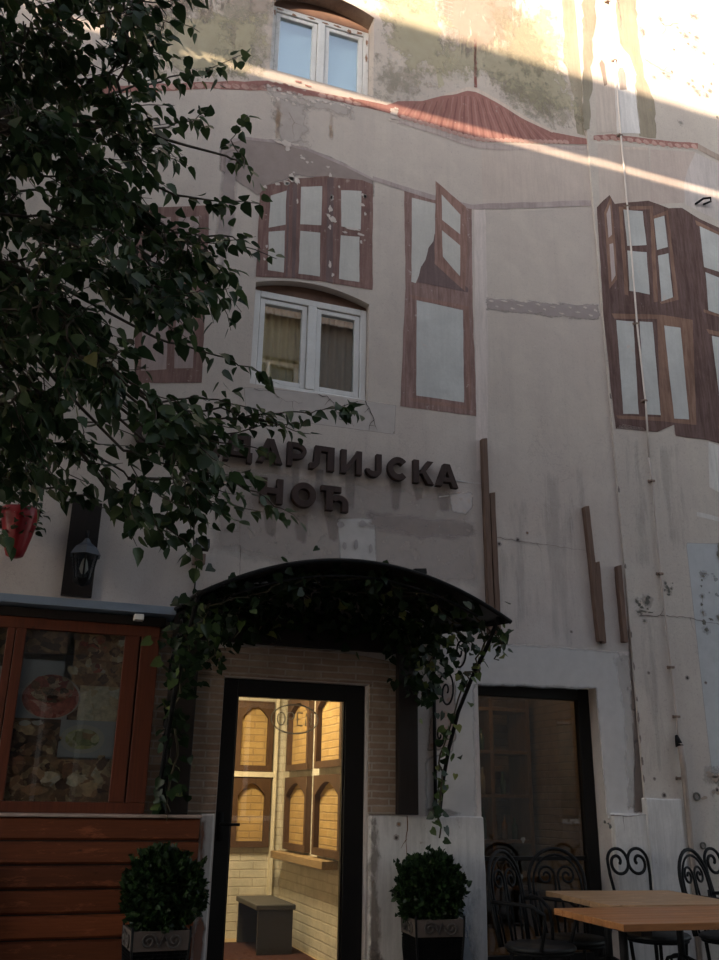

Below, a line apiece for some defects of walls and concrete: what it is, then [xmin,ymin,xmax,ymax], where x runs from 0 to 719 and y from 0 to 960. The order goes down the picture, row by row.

peeling [267,81,376,164]
peeling [263,172,300,189]
peeling [326,166,365,244]
crack [319,394,377,429]